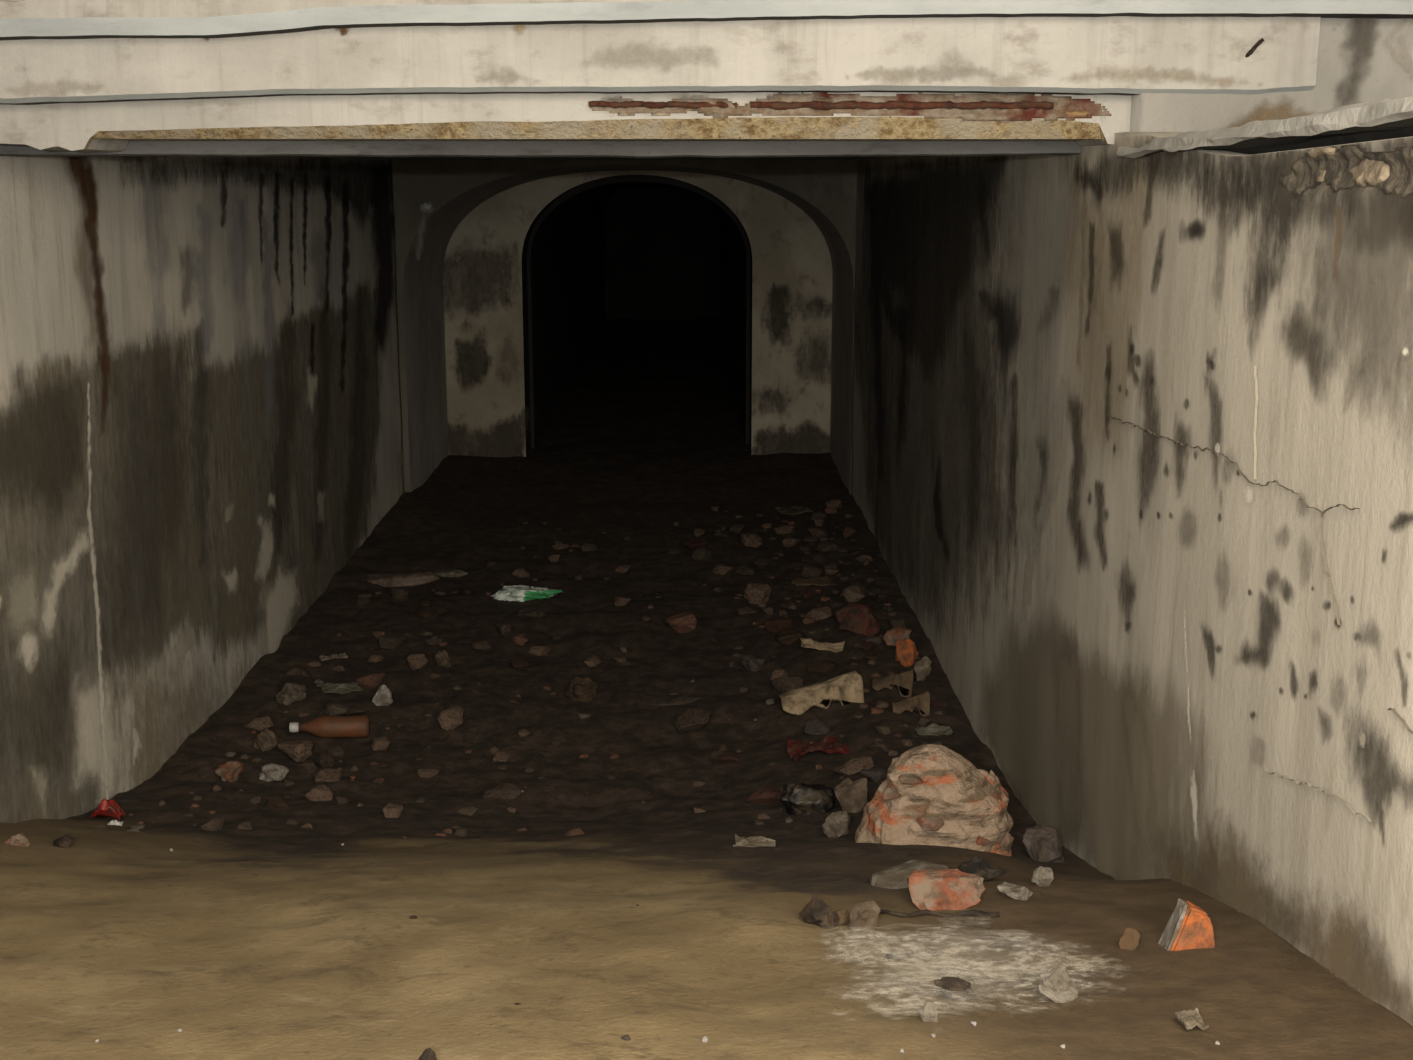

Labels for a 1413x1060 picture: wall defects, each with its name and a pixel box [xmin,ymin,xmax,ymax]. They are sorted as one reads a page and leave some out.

corrosion [69,157,109,420]
leakage [1075,137,1413,385]
spalling [1278,145,1413,196]
leakage [0,156,395,823]
leakage [1036,382,1108,569]
leakage [1105,345,1196,519]
leakage [1207,355,1221,471]
crack [1110,365,1360,625]
leakage [988,554,1203,881]
leakage [1204,629,1220,669]
crack [1264,767,1372,822]
crack [1388,708,1413,734]